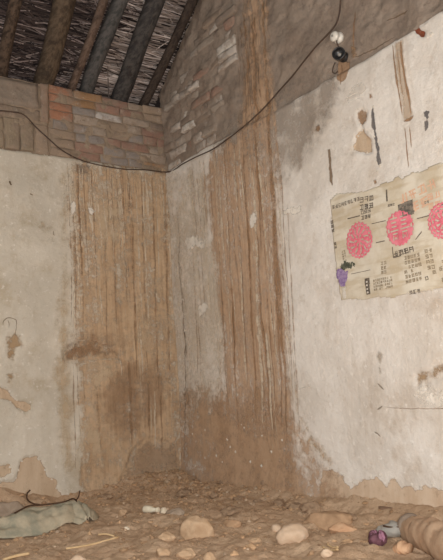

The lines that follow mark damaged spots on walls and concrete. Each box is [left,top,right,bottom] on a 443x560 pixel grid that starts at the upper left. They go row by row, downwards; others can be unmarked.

flaking render [353,105,382,172]
leakage [67,0,443,508]
peeling [0,456,62,497]